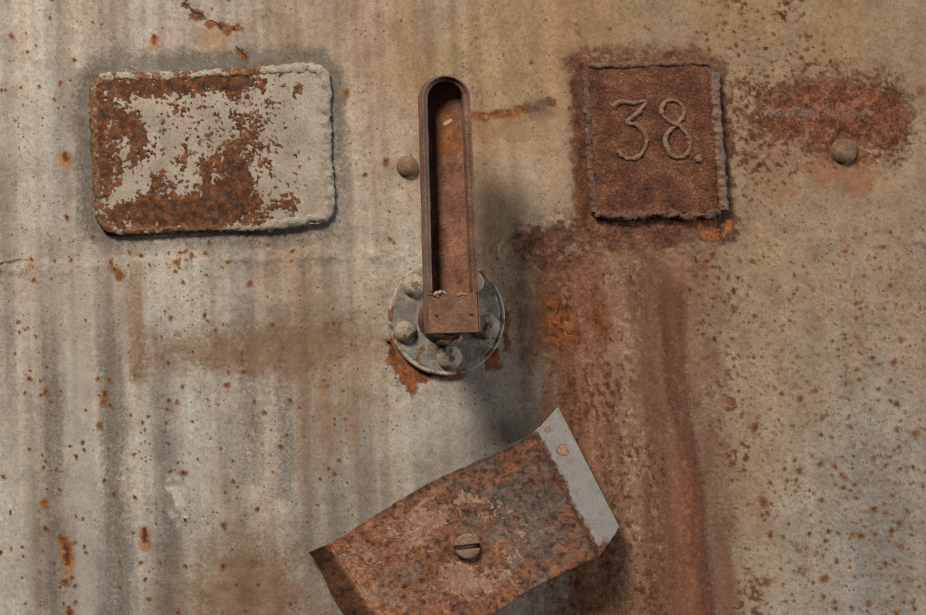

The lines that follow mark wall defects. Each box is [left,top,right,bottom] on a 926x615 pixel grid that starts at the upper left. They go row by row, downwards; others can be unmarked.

peeling [94,72,303,229]
corrosion [471,96,556,141]
corrosion [386,338,465,397]
corrosion [484,301,511,371]
corrosion [509,0,925,615]
corrosion [49,533,88,588]